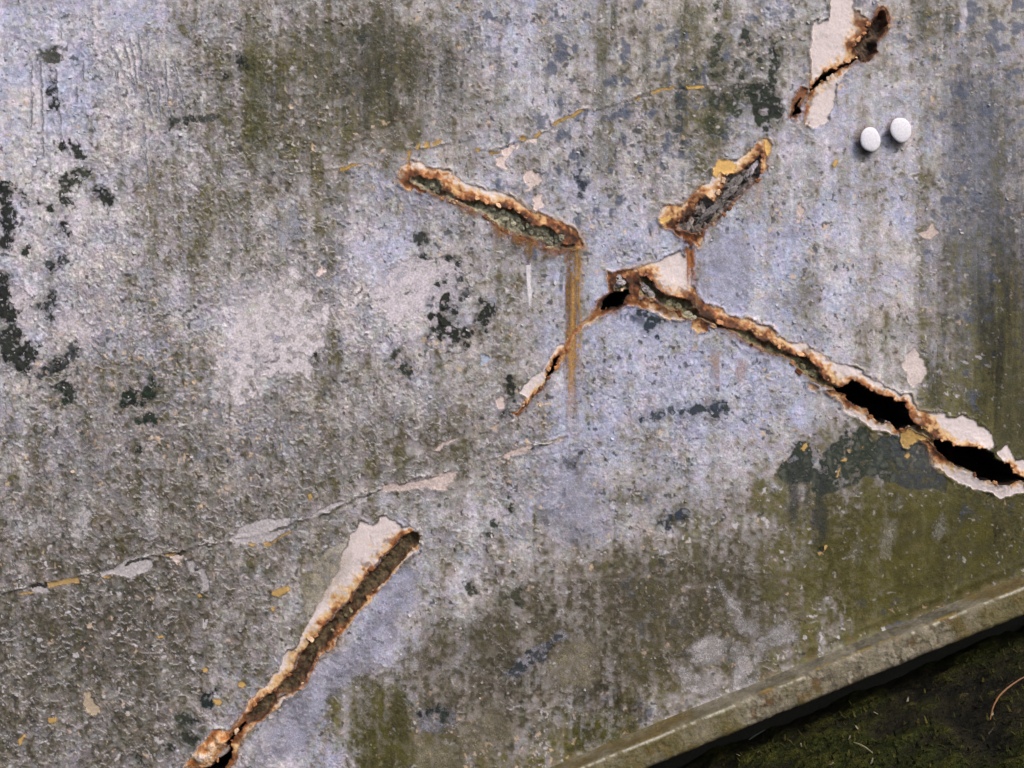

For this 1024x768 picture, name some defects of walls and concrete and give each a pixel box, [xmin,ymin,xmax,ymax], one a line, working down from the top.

damp [223,45,285,147]
damp [305,23,428,120]
damp [0,138,115,257]
damp [0,272,79,406]
damp [45,254,70,271]
damp [119,367,161,428]
peeling [0,0,550,768]
corrosion [563,250,582,402]
crack [512,139,1024,499]
damp [774,427,947,540]